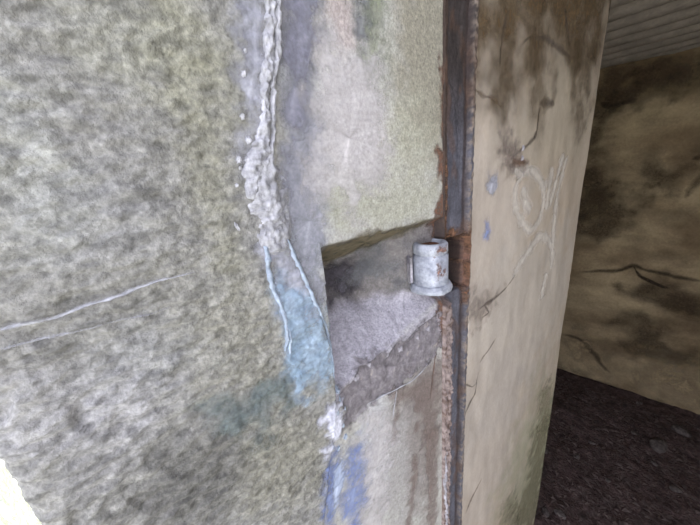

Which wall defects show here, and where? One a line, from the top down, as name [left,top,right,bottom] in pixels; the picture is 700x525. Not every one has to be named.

water stain [477,0,611,91]
crack [521,101,554,150]
rust [426,146,472,278]
crack [0,274,187,344]
water stain [234,0,398,525]
crack [594,265,691,288]
spalling [339,312,443,432]